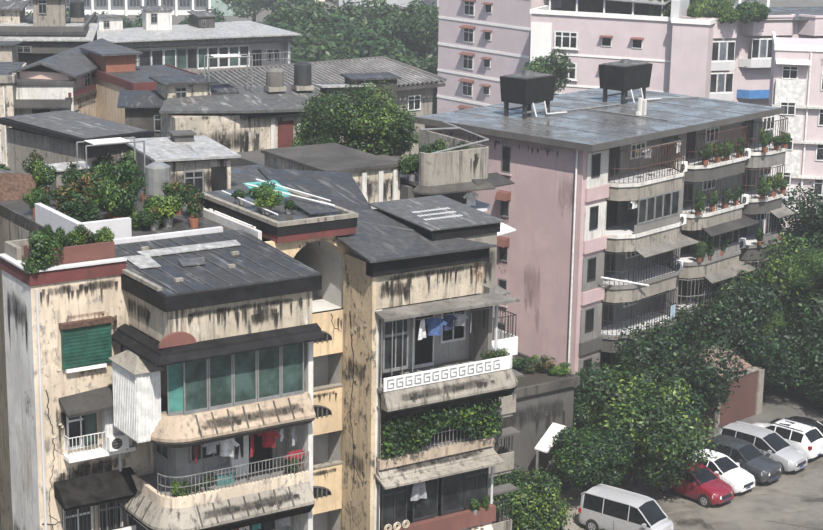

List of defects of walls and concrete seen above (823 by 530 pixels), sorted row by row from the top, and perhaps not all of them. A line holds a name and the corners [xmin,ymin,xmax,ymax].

water stain [212,132,259,152]
water stain [40,281,118,303]
water stain [381,251,493,301]
water stain [188,298,308,332]
crack [42,390,64,530]